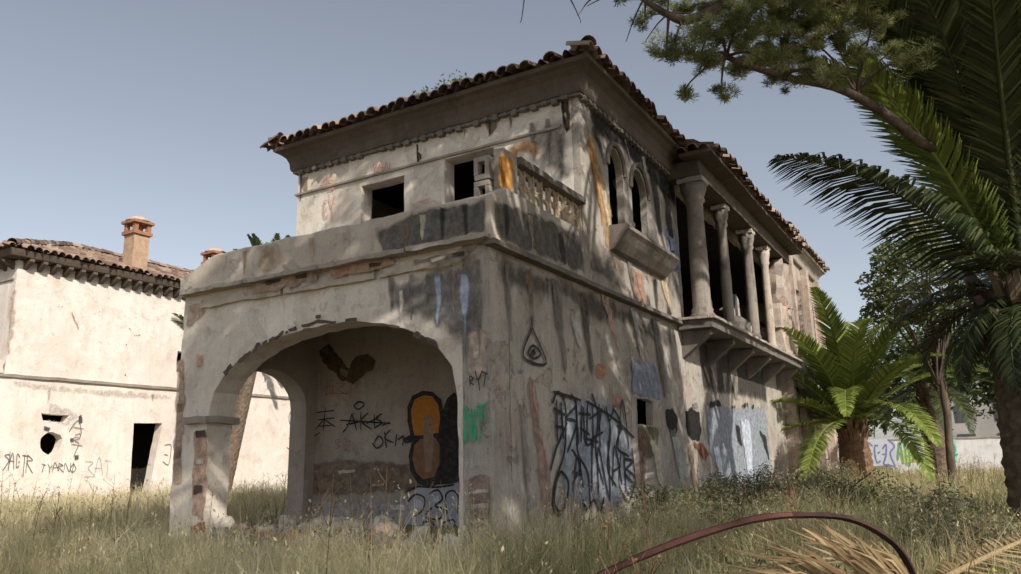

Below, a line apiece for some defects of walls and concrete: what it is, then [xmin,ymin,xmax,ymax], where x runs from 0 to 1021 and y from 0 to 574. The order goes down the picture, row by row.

spalling [187,304,205,326]
spalling [223,315,357,376]
peeling [319,344,375,384]
spalling [173,360,208,537]
peeling [312,460,423,519]